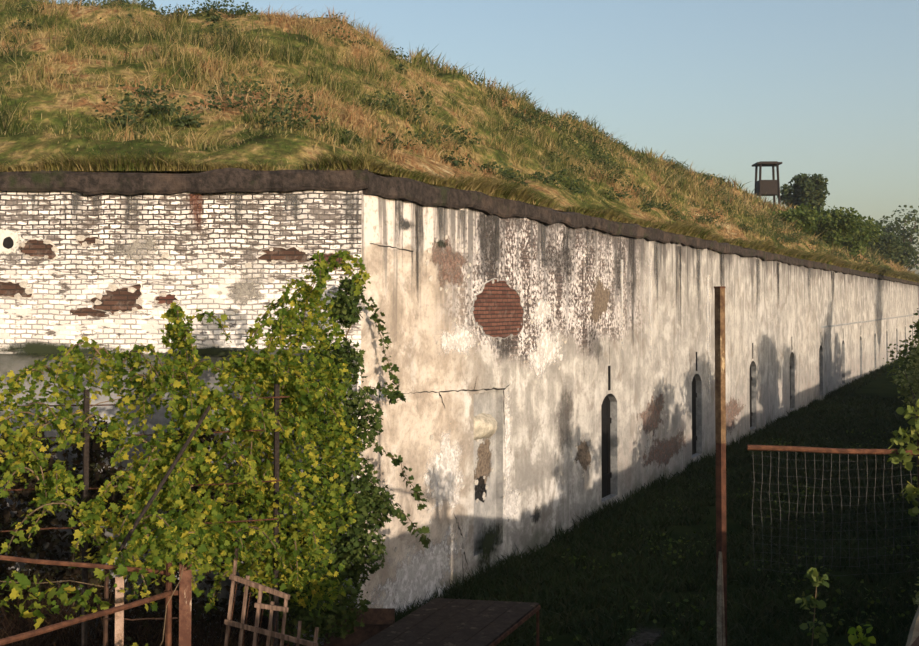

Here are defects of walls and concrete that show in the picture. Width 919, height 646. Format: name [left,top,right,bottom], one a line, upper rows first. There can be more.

spalling [0,280,34,300]
spalling [70,283,180,317]
spalling [217,246,352,312]
crack [370,243,413,276]
water stain [395,200,424,255]
water stain [437,206,445,231]
water stain [478,213,502,278]
flaking render [436,278,567,375]
water stain [542,223,572,275]
water stain [614,238,636,313]
crack [403,378,509,424]
peeling [424,396,521,523]